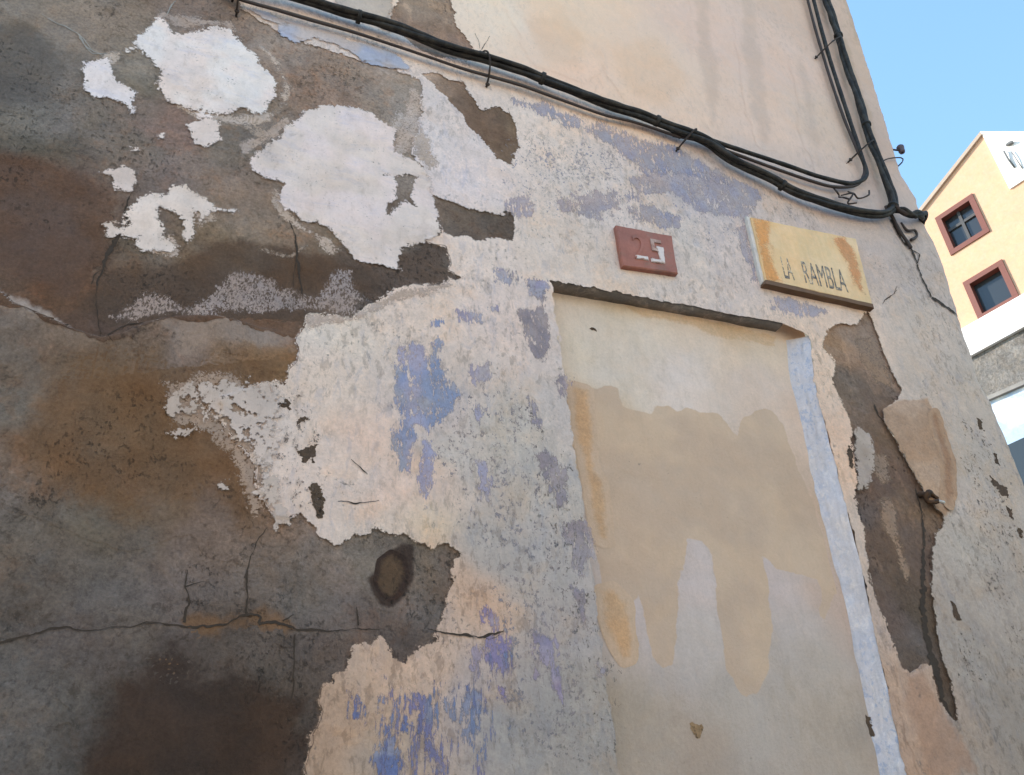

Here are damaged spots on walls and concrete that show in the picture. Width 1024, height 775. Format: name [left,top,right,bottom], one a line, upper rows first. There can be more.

flaking render [0,0,765,344]
crack [65,192,142,341]
leakage [0,13,457,517]
crack [890,219,957,315]
leakage [12,622,326,775]
crack [0,528,380,703]
leakage [362,538,419,613]
crack [428,629,504,639]
leakage [571,379,838,701]
flaking render [823,312,986,722]
flaking render [960,418,1024,608]